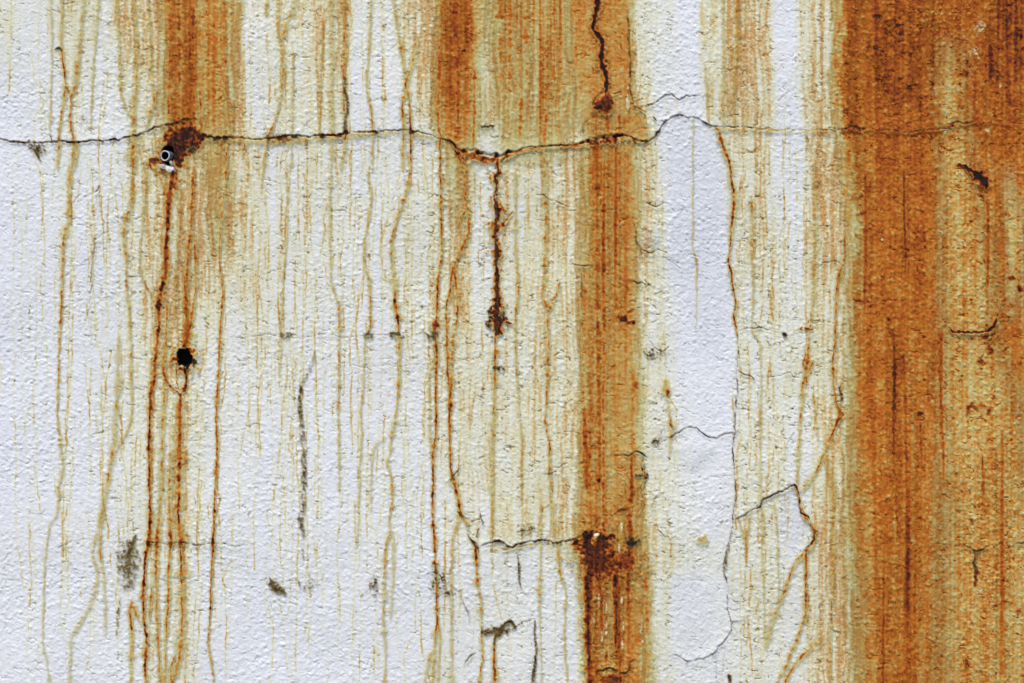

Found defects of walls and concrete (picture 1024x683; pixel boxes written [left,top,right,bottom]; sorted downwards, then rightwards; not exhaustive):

crack [2,118,191,144]
rust [68,0,243,683]
rust [424,0,656,683]
crack [204,0,1013,631]
rust [737,0,1024,683]